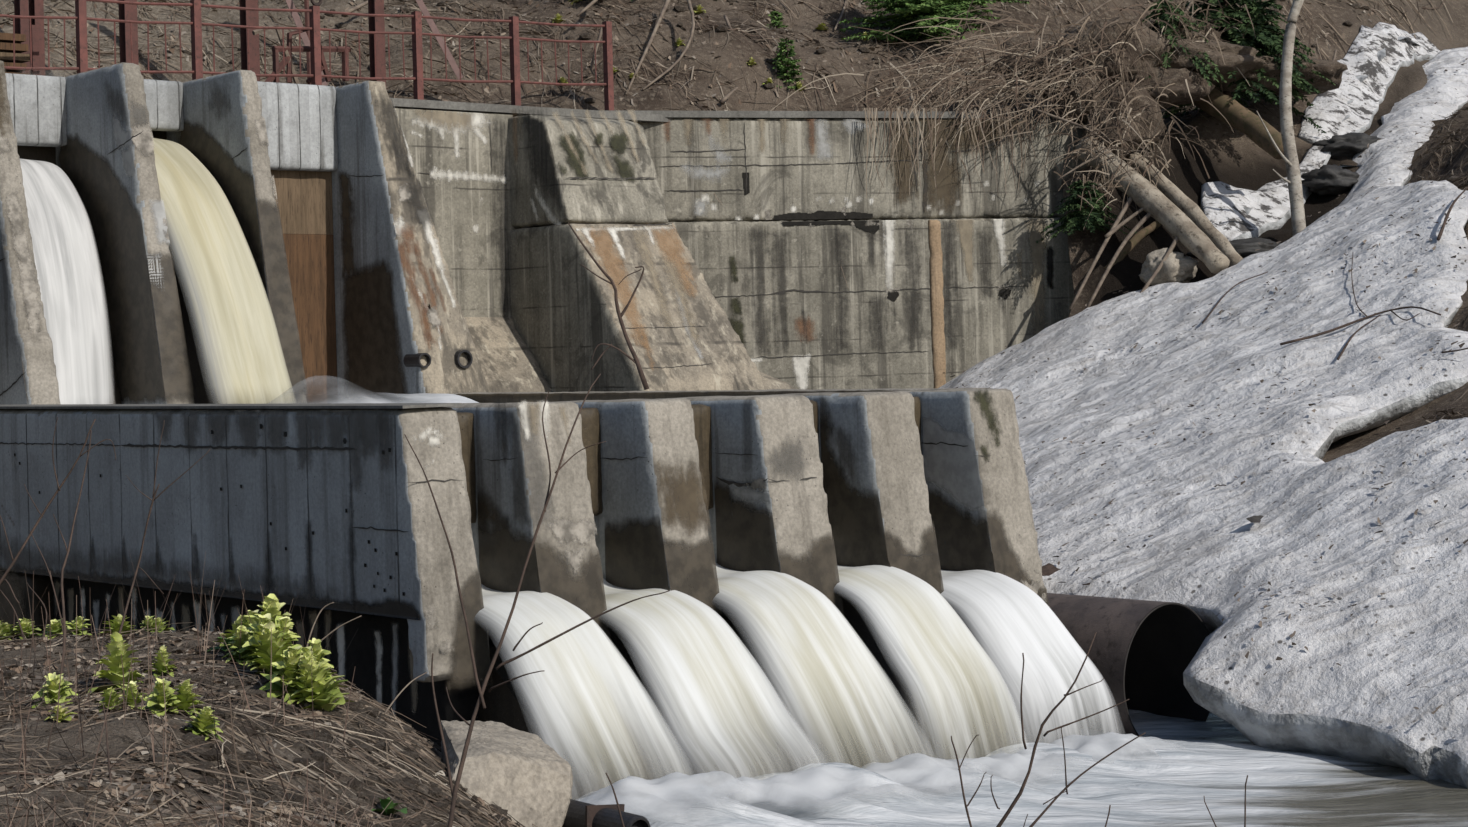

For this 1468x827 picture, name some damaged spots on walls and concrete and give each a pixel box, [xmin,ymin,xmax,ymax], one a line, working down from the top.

leakage [526,110,667,258]
rust [398,229,442,336]
leakage [419,429,439,444]
leakage [452,201,1049,686]
leakage [0,526,345,680]
leakage [375,625,417,715]